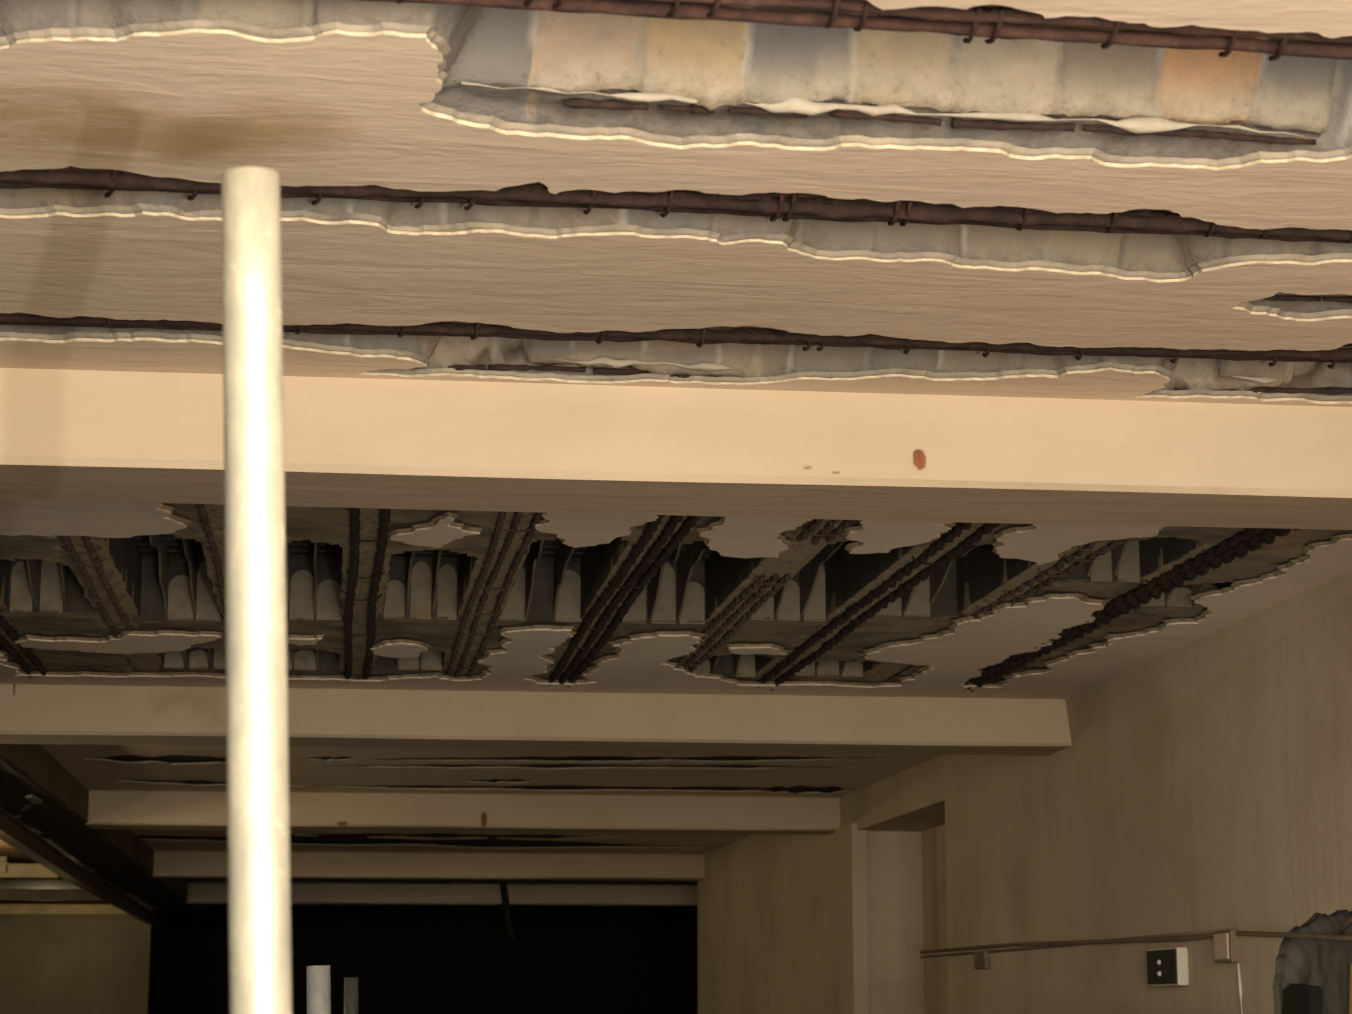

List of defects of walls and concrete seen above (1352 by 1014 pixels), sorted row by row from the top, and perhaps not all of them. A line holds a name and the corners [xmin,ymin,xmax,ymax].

corrosion [360,0,1352,61]
flaking render [0,0,1352,167]
corrosion [0,166,221,201]
flaking render [0,188,222,217]
corrosion [280,184,1352,244]
flaking render [280,197,1352,280]
corrosion [0,312,223,332]
corrosion [282,322,1352,369]
flaking render [282,321,1352,401]
corrosion [914,450,926,470]
flaking render [287,508,1035,690]
flaking render [859,528,1352,692]